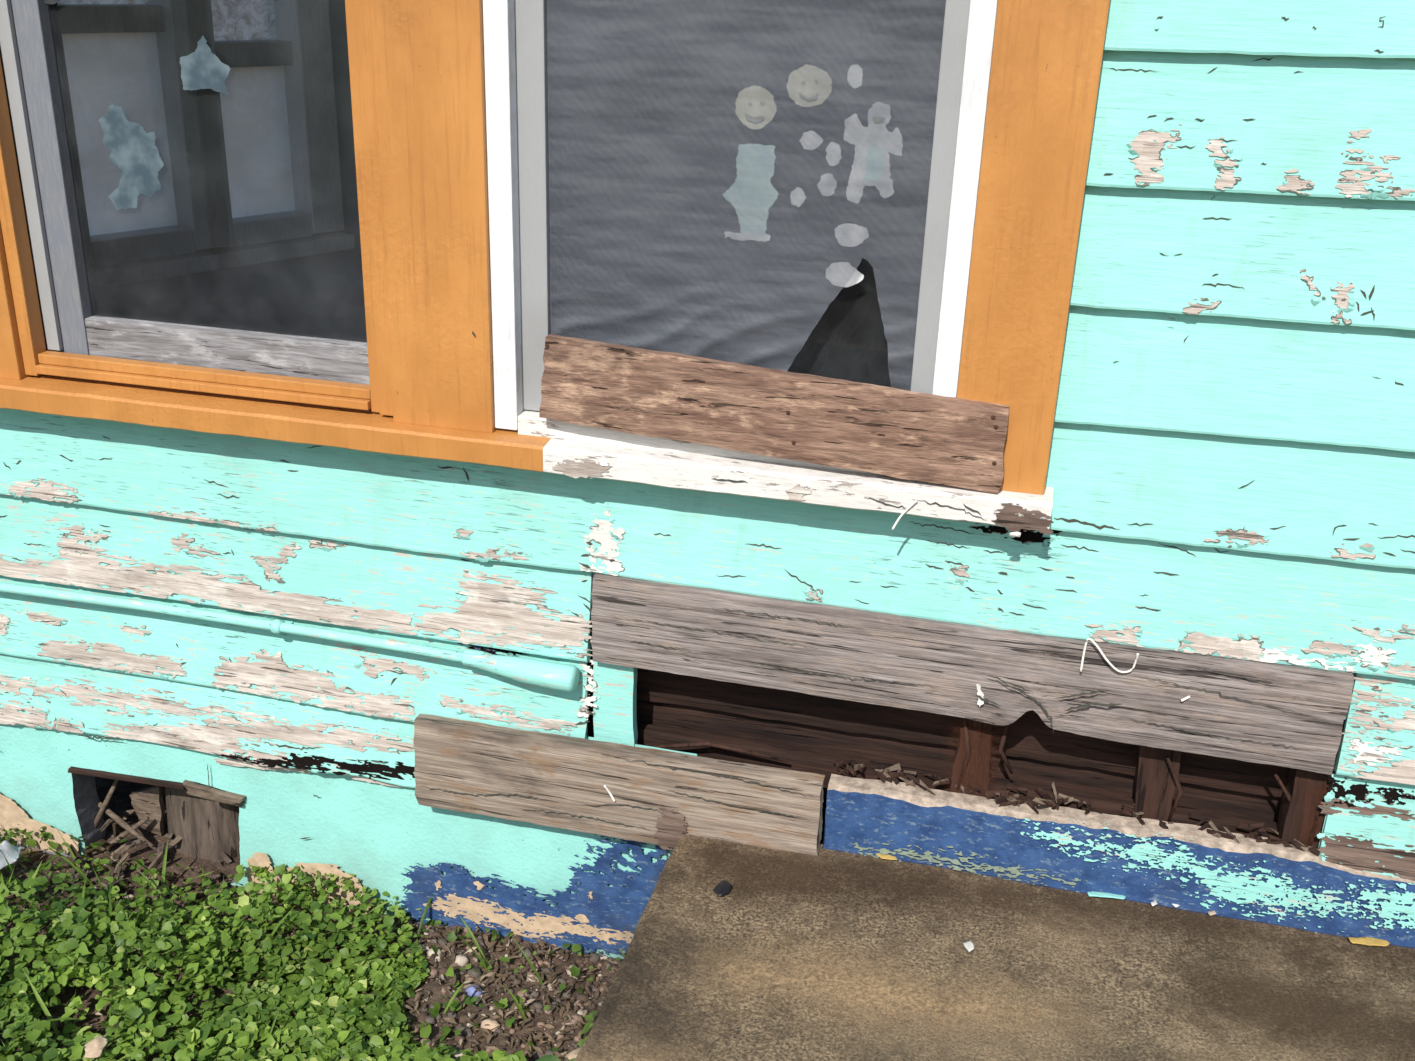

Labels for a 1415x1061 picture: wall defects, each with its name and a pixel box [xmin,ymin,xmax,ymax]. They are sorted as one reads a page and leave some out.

peeling [1127,124,1183,186]
peeling [1335,129,1415,200]
peeling [1300,269,1358,325]
peeling [3,478,84,504]
peeling [552,458,613,479]
peeling [580,508,625,576]
peeling [968,503,1056,549]
peeling [0,507,601,735]
peeling [0,612,437,774]
peeling [1174,620,1415,821]
peeling [400,834,674,959]
peeling [1016,814,1415,936]